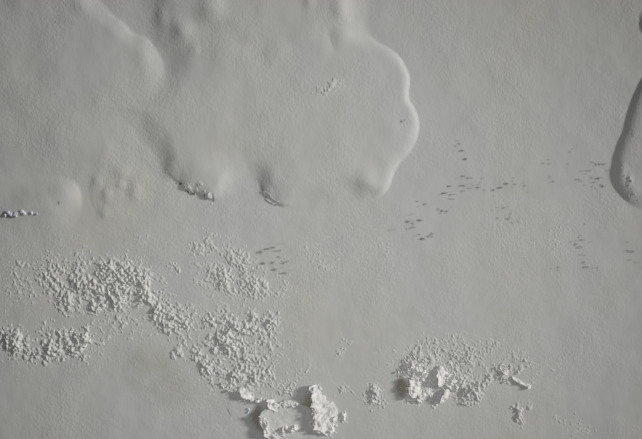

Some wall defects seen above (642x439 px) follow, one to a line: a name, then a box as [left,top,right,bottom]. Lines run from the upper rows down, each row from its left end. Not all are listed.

peeling [397,356,462,410]
peeling [496,367,531,390]
peeling [220,382,348,439]